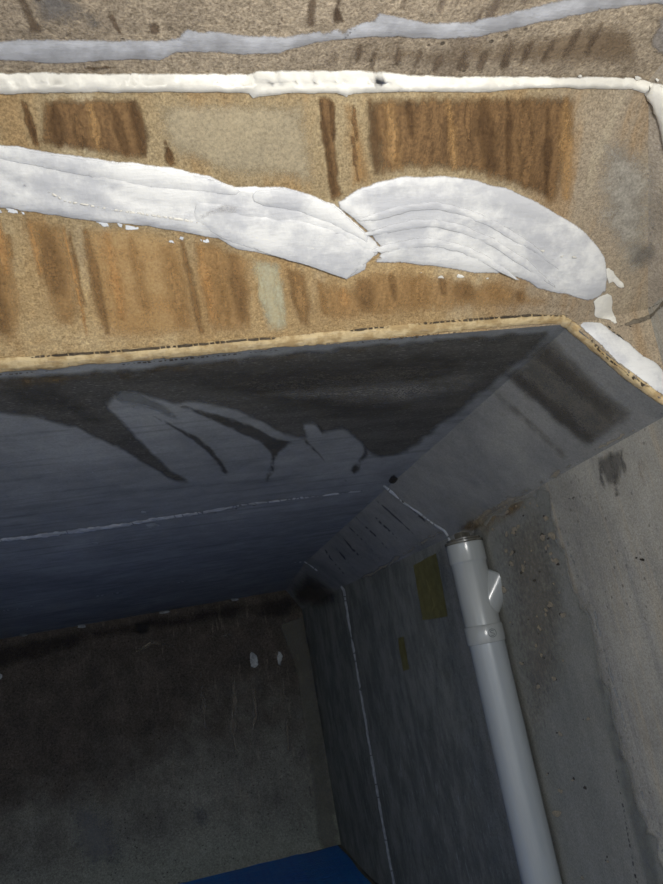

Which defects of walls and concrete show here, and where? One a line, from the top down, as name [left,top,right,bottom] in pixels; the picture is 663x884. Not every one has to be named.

leakage [308,0,316,26]
leakage [500,30,632,69]
rust [21,100,147,157]
leakage [166,108,309,177]
rust [319,98,341,199]
rust [351,107,363,181]
rust [369,98,573,201]
rust [30,226,85,323]
rust [84,230,248,333]
leakage [258,263,284,328]
crack [591,301,663,387]
leakage [0,334,627,481]